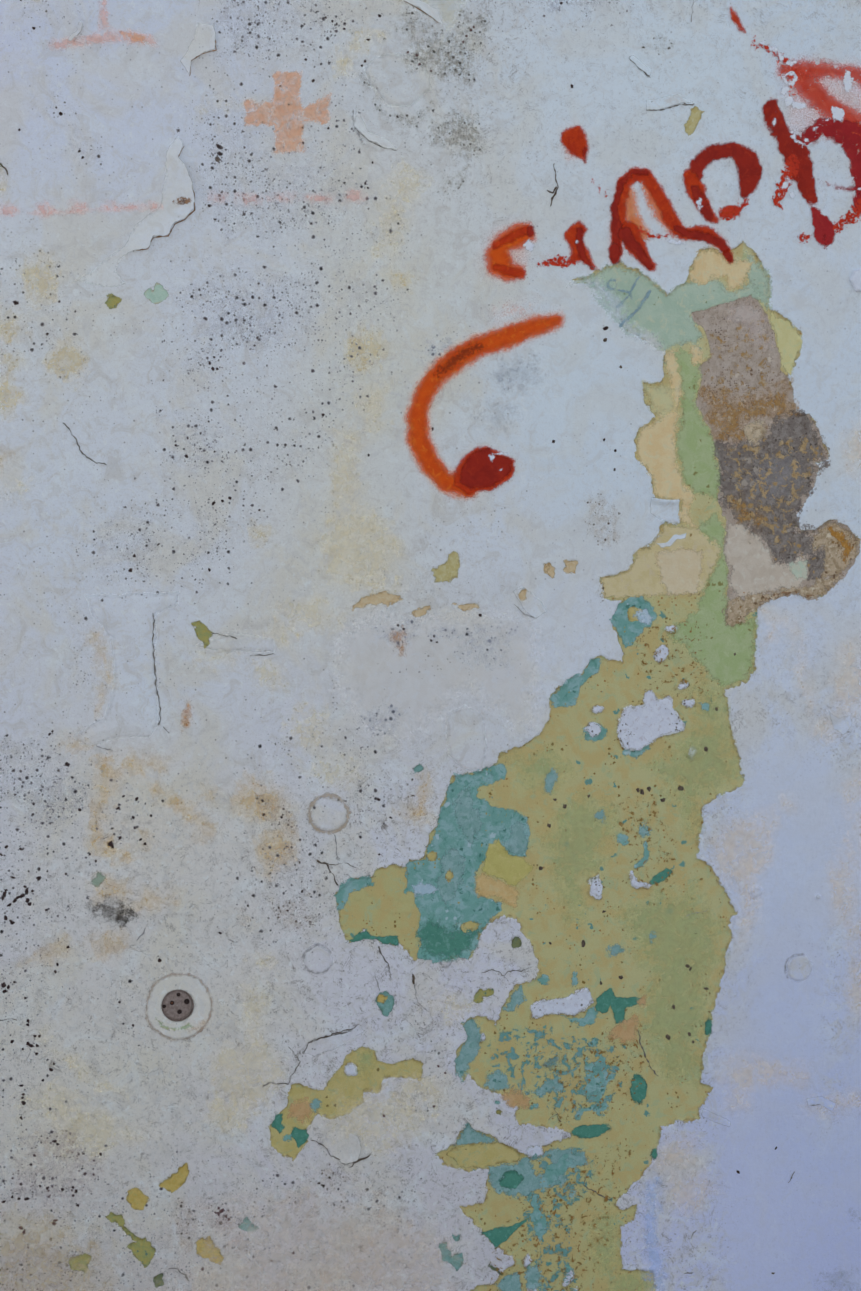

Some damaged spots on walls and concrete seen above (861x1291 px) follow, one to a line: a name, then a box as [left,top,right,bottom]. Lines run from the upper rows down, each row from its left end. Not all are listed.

peeling [77,137,195,309]
leakage [72,0,490,604]
crack [63,423,107,465]
crack [152,615,169,733]
peeling [334,241,860,1291]
crack [263,1024,358,1087]
peeling [268,1024,423,1165]
peeling [69,1254,91,1275]
peeling [106,1163,189,1288]
peeling [196,1236,224,1265]